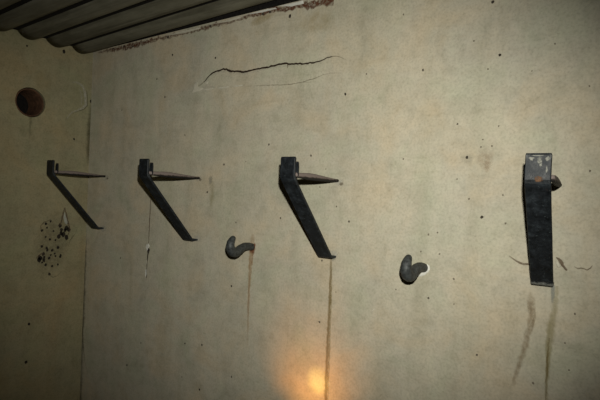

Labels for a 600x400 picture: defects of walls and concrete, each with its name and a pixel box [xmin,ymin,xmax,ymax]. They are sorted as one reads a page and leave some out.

crack [204,56,333,82]